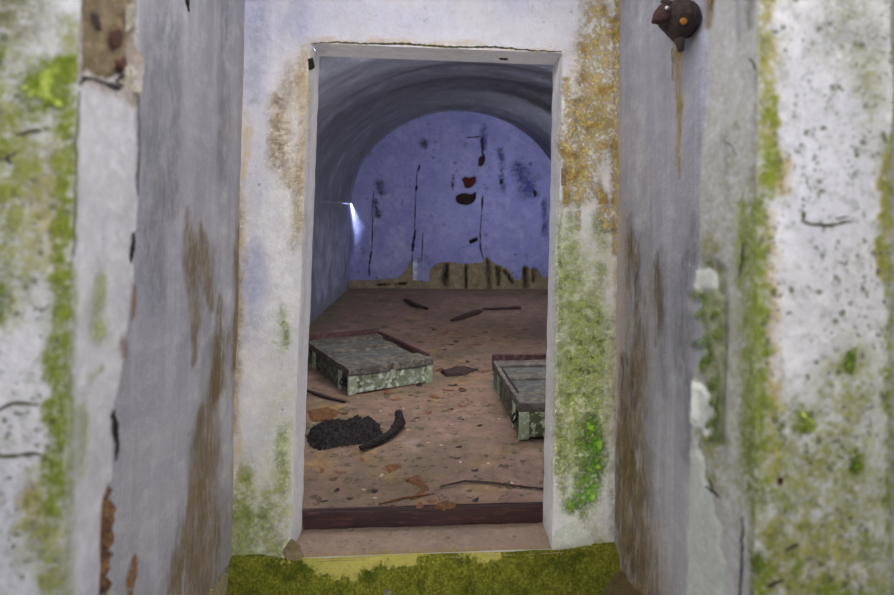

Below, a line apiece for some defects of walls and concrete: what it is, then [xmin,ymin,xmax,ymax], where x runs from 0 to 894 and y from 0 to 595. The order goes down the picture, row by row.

spalling [82,0,142,95]
crack [0,128,42,165]
rust [672,47,681,175]
crack [801,211,854,232]
flaking render [349,257,548,289]
crack [0,401,39,411]
crack [0,451,42,459]
damp [172,212,239,595]
damp [585,264,607,477]
flaking render [686,268,729,595]
spalling [99,476,117,595]